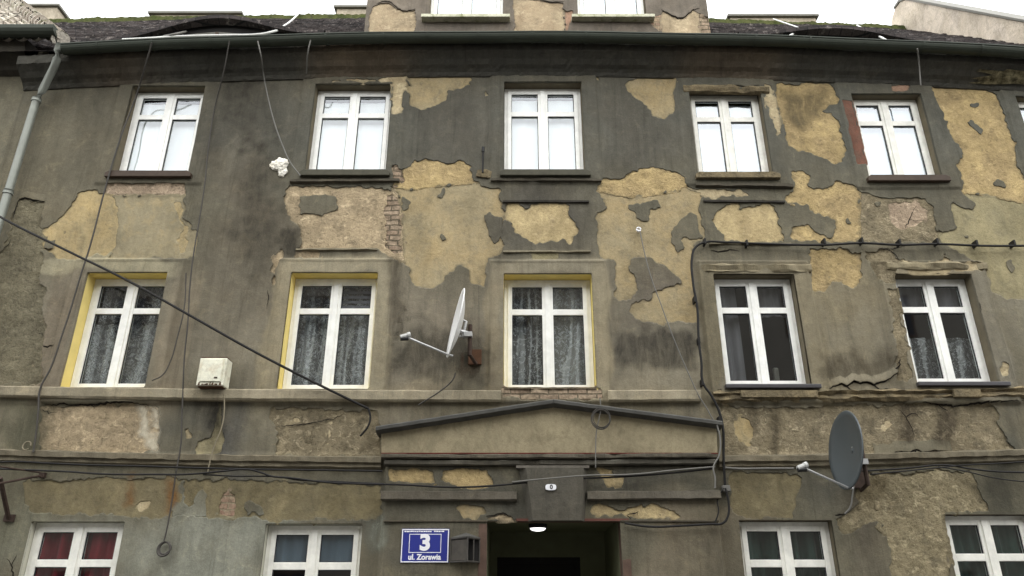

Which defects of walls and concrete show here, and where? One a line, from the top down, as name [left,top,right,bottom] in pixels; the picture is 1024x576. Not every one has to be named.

peeling [332,76,472,114]
peeling [270,159,579,288]
peeling [595,69,1024,382]
spalling [0,183,198,386]
crack [828,360,901,390]
spalling [39,402,161,453]
peeling [590,503,680,523]